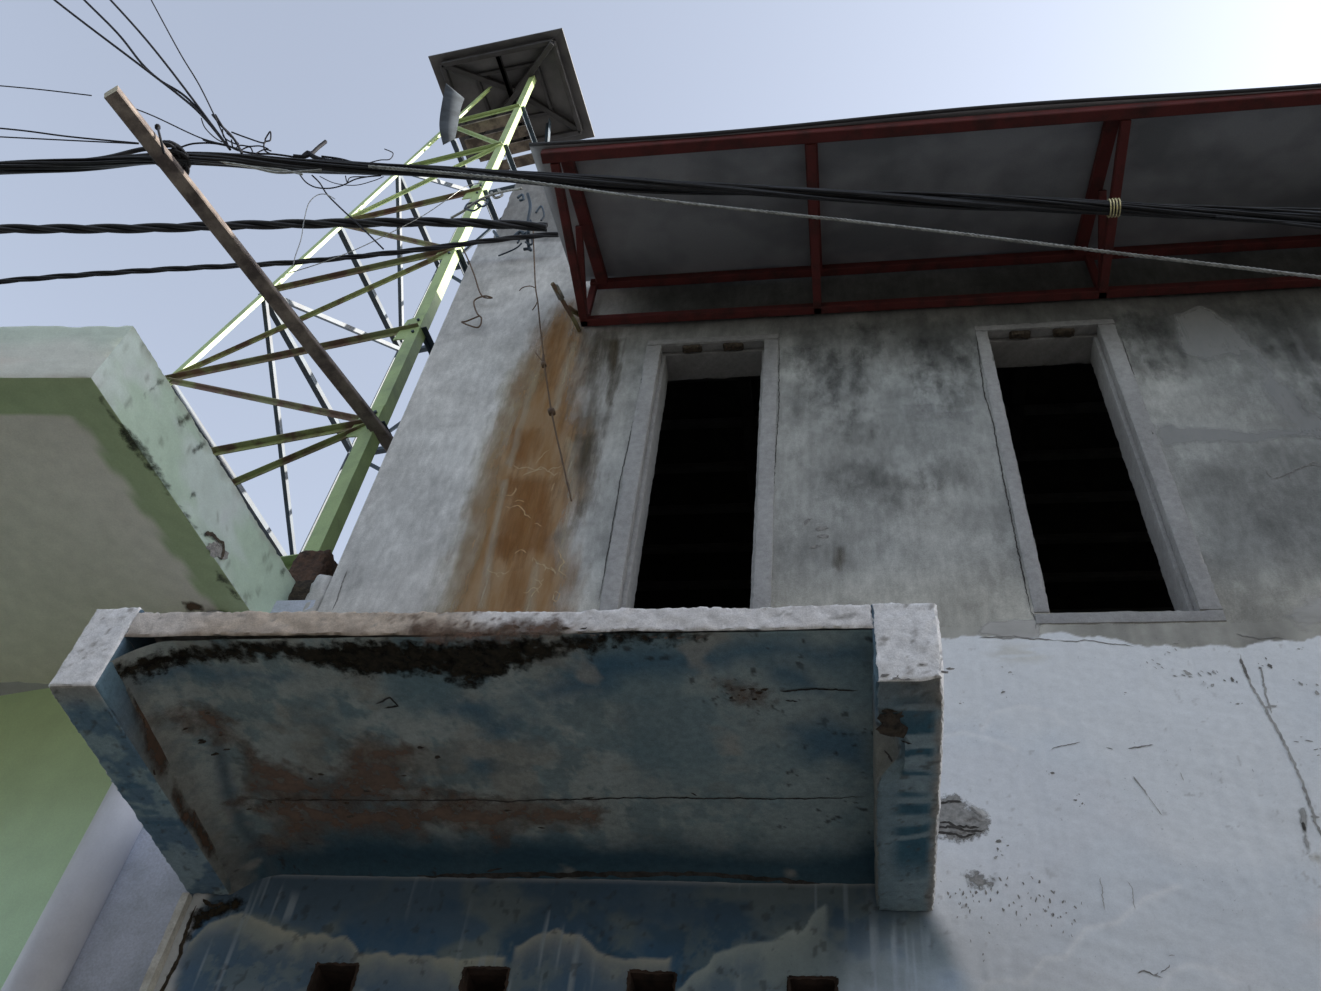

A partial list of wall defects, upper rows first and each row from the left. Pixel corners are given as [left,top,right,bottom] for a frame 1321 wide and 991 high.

water stain [581,337,618,383]
rust [450,305,585,612]
spalling [205,531,229,560]
water stain [115,630,706,689]
crack [376,697,399,708]
crack [781,688,858,702]
crack [1238,634,1321,847]
crack [242,793,853,803]
spalling [938,794,1009,859]
water stain [186,898,243,940]
peeling [936,871,1082,937]